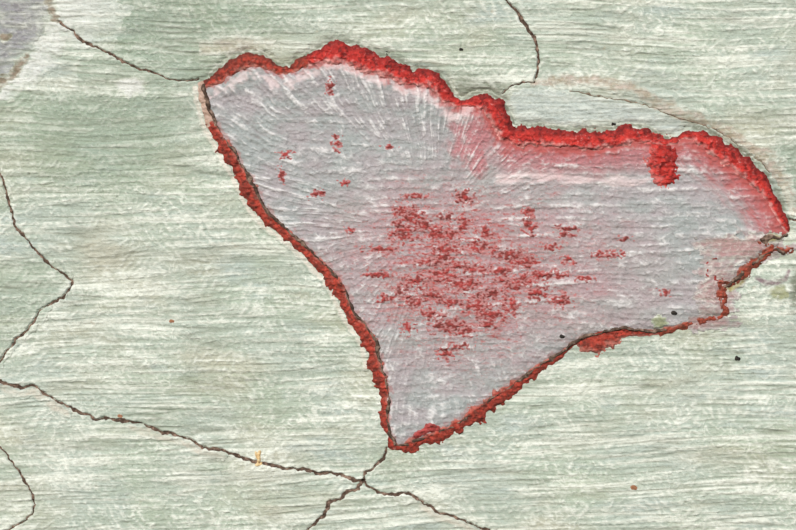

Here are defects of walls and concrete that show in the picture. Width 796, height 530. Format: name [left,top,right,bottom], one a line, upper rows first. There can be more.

crack [59,21,199,82]
crack [502,0,540,94]
crack [570,91,770,173]
crack [0,173,490,530]